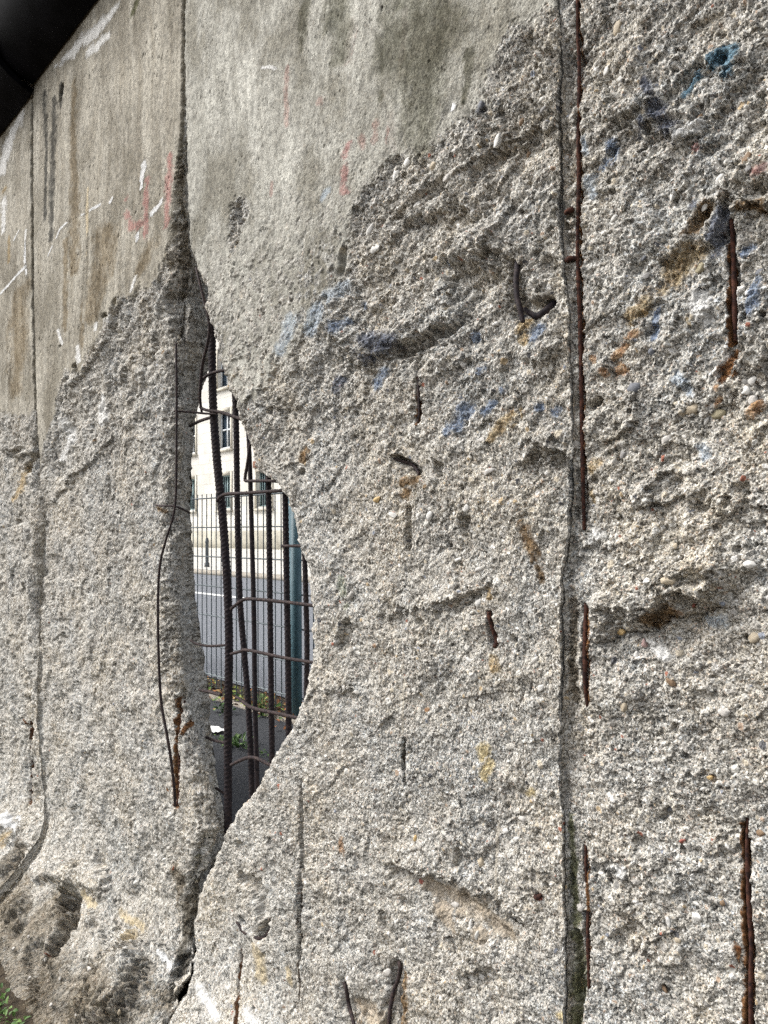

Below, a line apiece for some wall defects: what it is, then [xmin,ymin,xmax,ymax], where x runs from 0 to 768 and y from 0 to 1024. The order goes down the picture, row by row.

corrosion [577,0,640,501]
corrosion [713,243,741,408]
corrosion [746,400,763,419]
spalling [0,3,575,1024]
spalling [559,0,768,1024]
corrosion [166,697,195,808]
corrosion [733,821,756,1024]